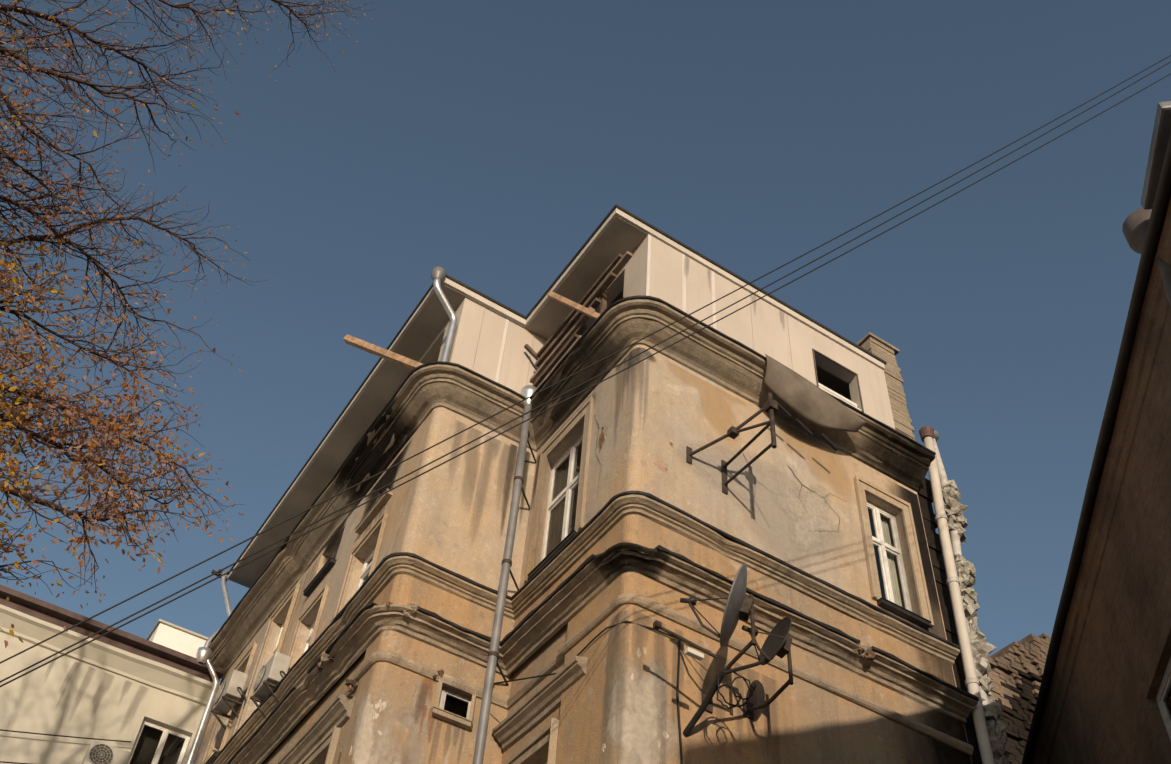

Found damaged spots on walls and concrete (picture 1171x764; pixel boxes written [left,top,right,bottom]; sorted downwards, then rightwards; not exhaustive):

water stain [505,444,541,505]
crack [788,466,845,532]
water stain [592,542,668,580]